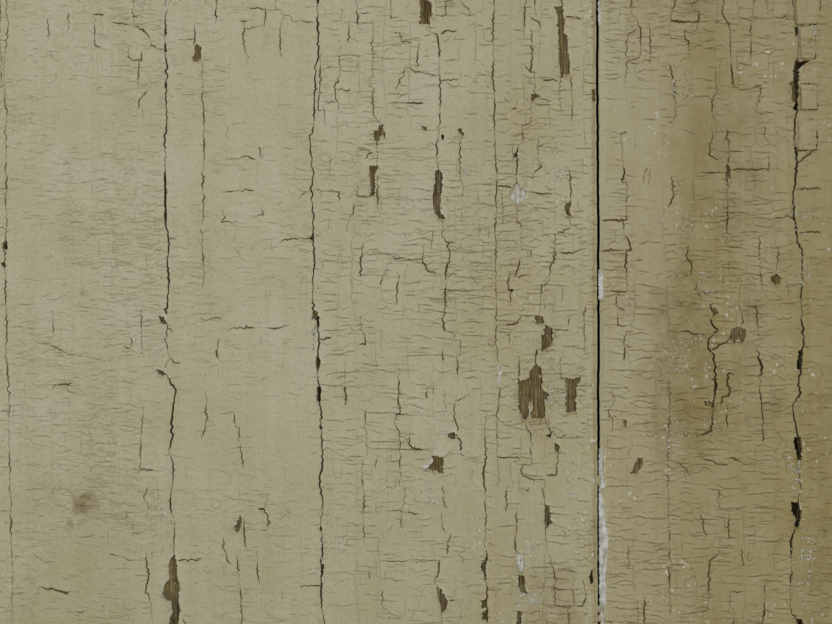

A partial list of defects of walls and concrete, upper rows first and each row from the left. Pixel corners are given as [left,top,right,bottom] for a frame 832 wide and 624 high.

peeling [419,0,436,24]
peeling [554,6,573,79]
crack [0,0,84,616]
crack [93,0,202,562]
peeling [163,556,183,624]
crack [240,0,470,624]
peeling [367,165,378,197]
peeling [433,170,449,222]
crack [387,383,568,622]
crack [452,0,586,380]
peeling [518,353,596,501]
crack [625,0,821,622]